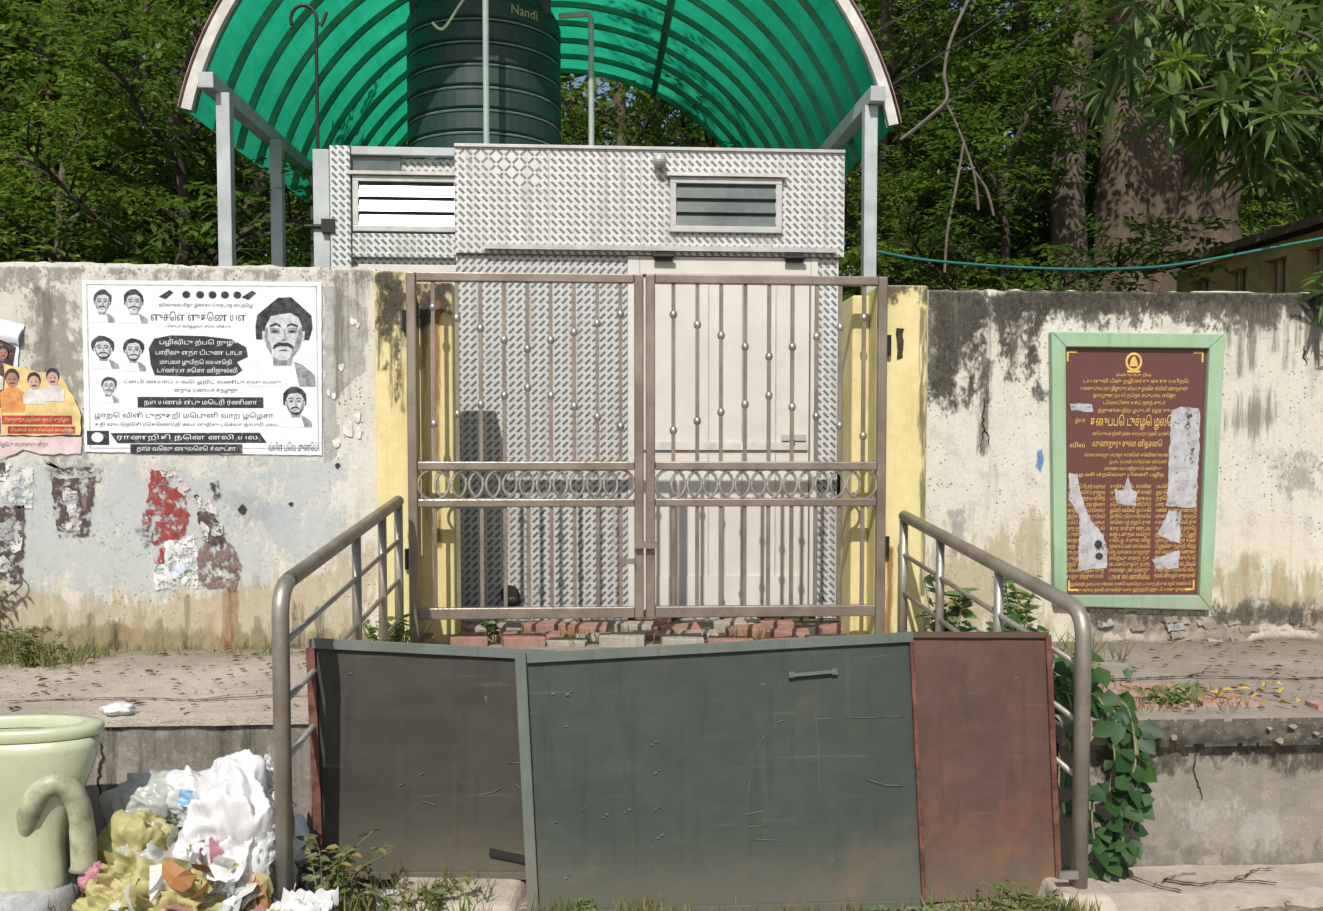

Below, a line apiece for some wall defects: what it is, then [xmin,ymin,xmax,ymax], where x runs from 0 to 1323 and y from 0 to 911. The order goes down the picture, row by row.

leakage [374,271,452,547]
crack [979,360,990,454]
leakage [888,285,1323,413]